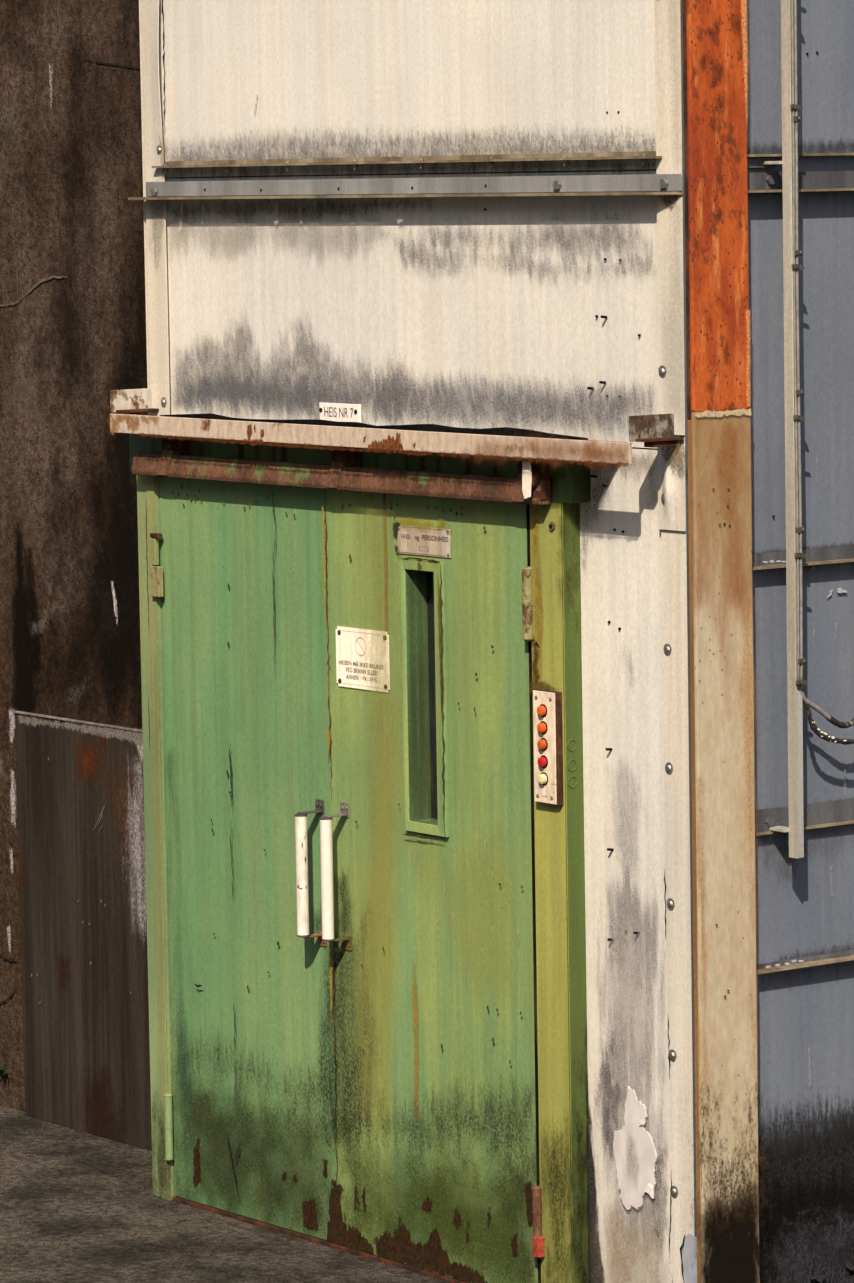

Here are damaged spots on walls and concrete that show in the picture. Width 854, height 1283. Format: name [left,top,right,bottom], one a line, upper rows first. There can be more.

corrosion [733,0,748,117]
water stain [167,133,654,161]
water stain [173,199,415,252]
water stain [399,215,650,274]
water stain [176,321,652,428]
corrosion [695,311,752,418]
corrosion [108,414,687,476]
water stain [597,879,665,1249]
corrosion [193,1138,201,1186]
peeling [613,1086,658,1210]
corrosion [302,1159,488,1283]